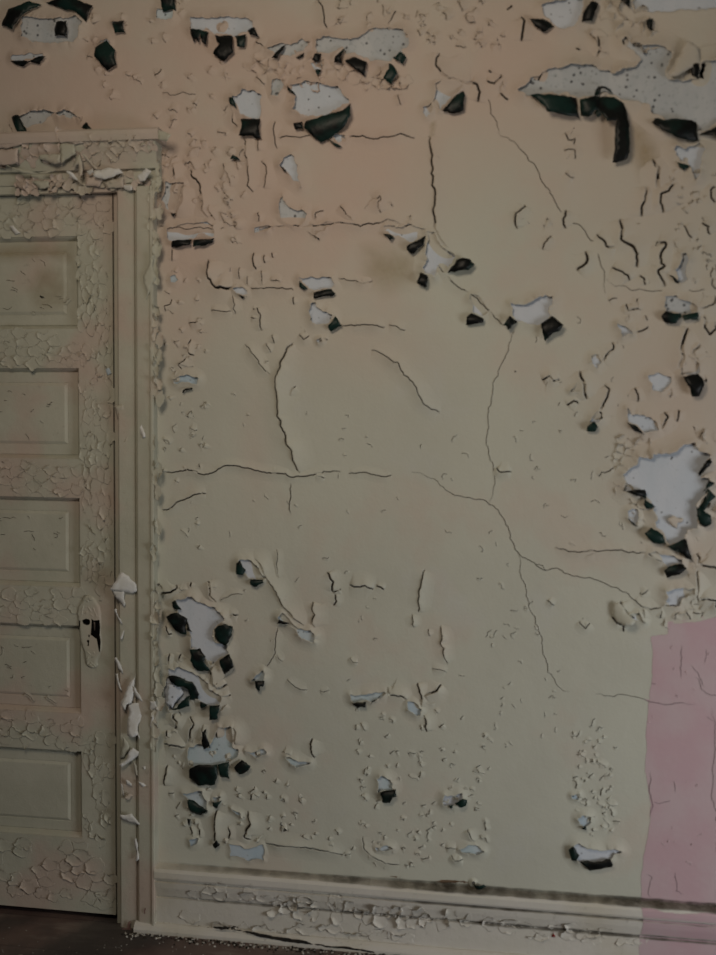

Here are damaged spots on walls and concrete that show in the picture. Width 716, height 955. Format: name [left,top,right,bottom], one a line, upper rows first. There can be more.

crack [152,66,196,130]
peeling [0,0,506,252]
crack [308,0,339,30]
peeling [377,218,475,290]
crack [159,52,716,692]
peeling [506,0,716,327]
peeling [573,393,716,629]
peeling [150,583,343,852]
crack [185,792,400,873]
crack [158,547,456,786]
peeling [539,712,632,875]
crack [596,646,716,820]